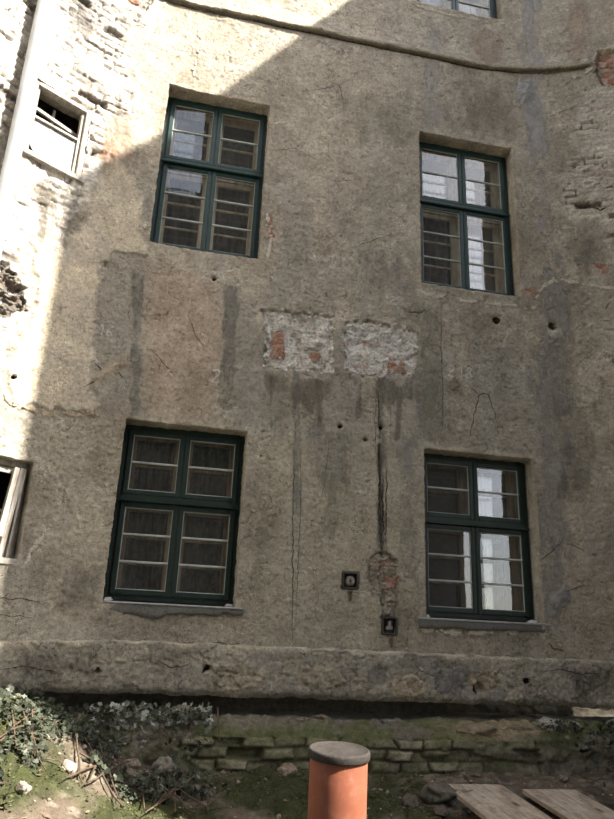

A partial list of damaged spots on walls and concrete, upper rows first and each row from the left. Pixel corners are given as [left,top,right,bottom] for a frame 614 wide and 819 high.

flaking render [572,44,614,85]
flaking render [0,261,29,318]
flaking render [261,306,419,379]
crack [469,389,499,440]
flaking render [366,549,400,617]